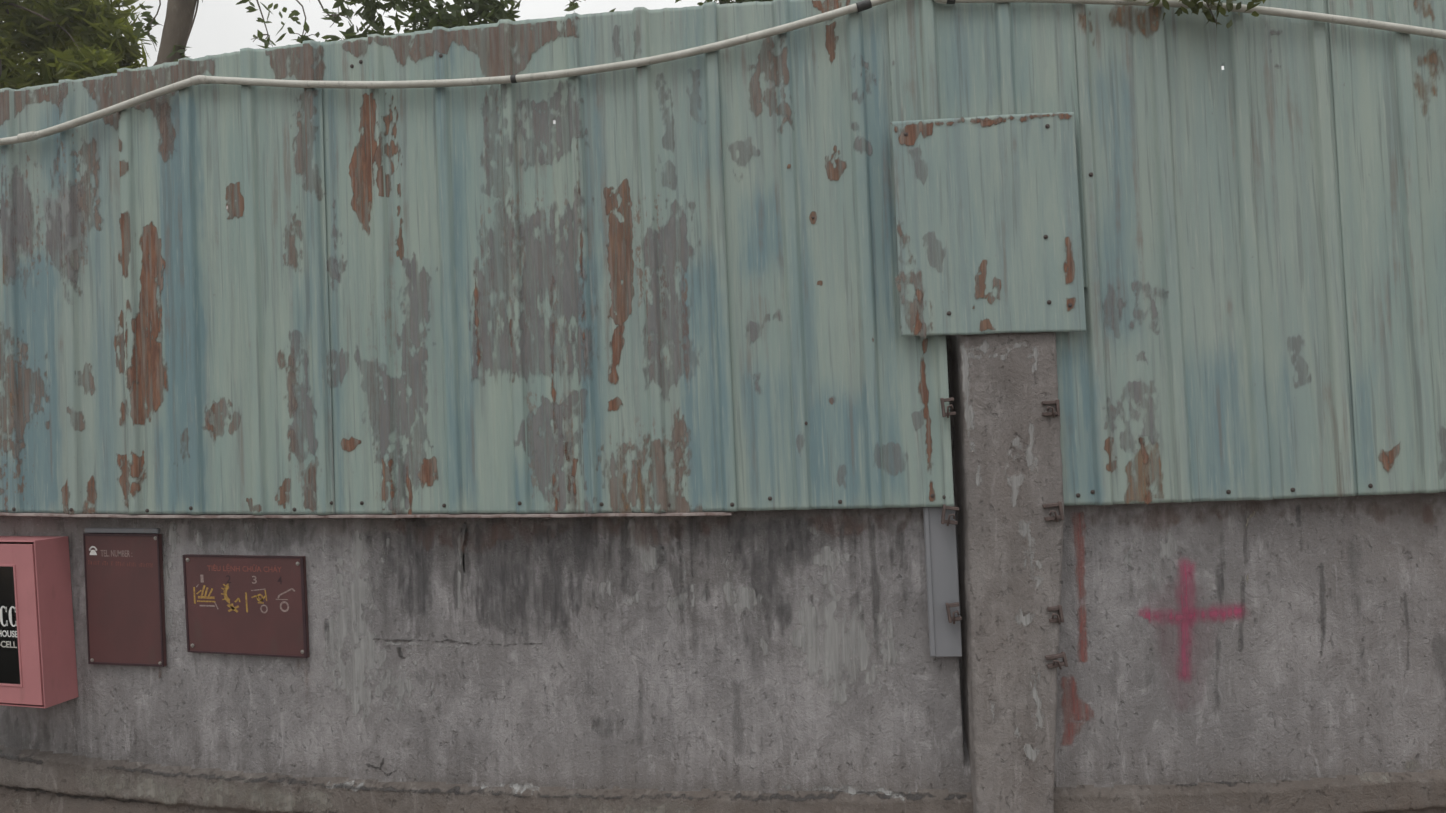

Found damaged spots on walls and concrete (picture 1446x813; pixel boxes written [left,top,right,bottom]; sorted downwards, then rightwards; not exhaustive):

rust [0,59,215,177]
rust [349,92,404,260]
peeling [518,82,587,167]
peeling [0,330,49,463]
rust [114,212,168,426]
peeling [326,254,433,511]
peeling [469,189,592,382]
rust [603,178,634,411]
peeling [597,411,700,518]
peeling [644,200,694,398]
damp [668,520,895,704]